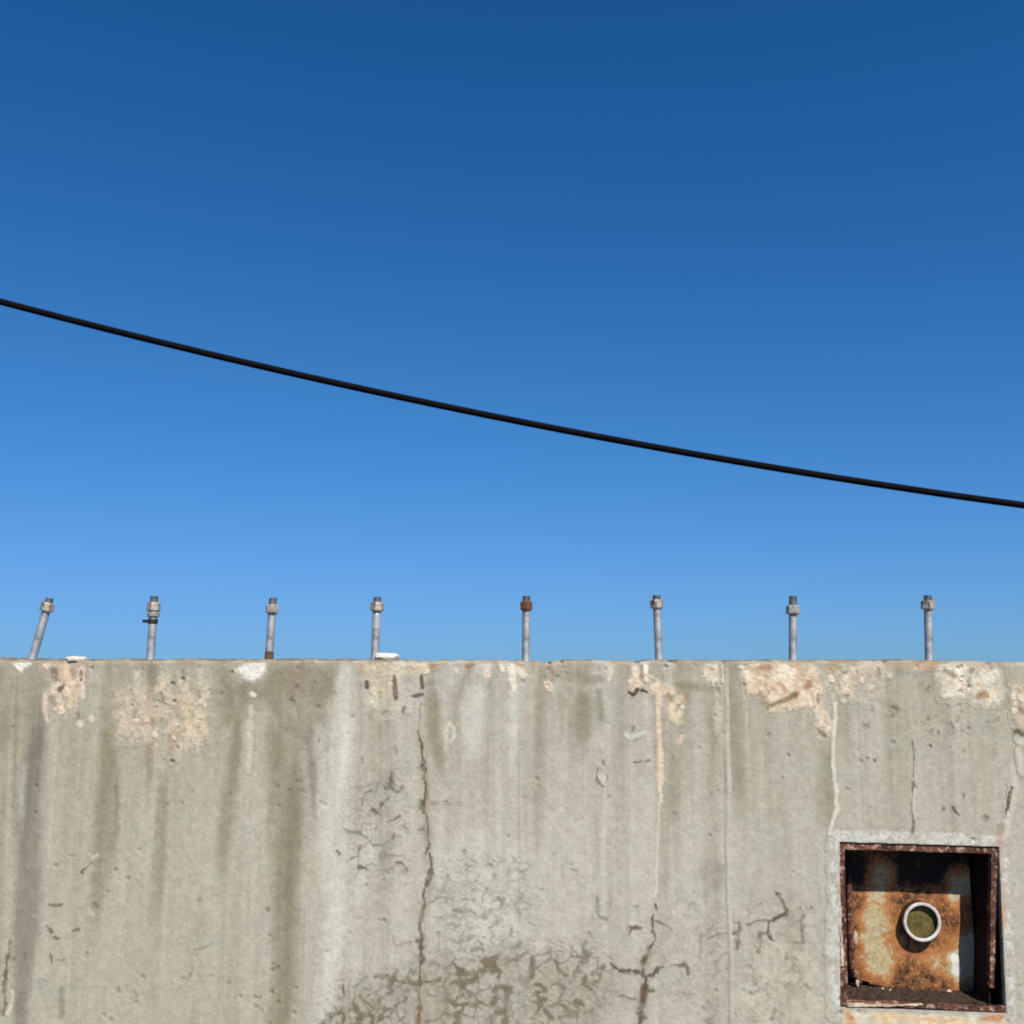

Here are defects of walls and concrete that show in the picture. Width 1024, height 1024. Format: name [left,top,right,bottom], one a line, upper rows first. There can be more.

spalling [40,656,220,766]
spalling [604,664,691,804]
spalling [699,663,1024,753]
leakage [0,662,73,1024]
leakage [82,704,125,969]
leakage [141,750,172,952]
crack [313,701,826,1024]
corrosion [994,828,1010,930]